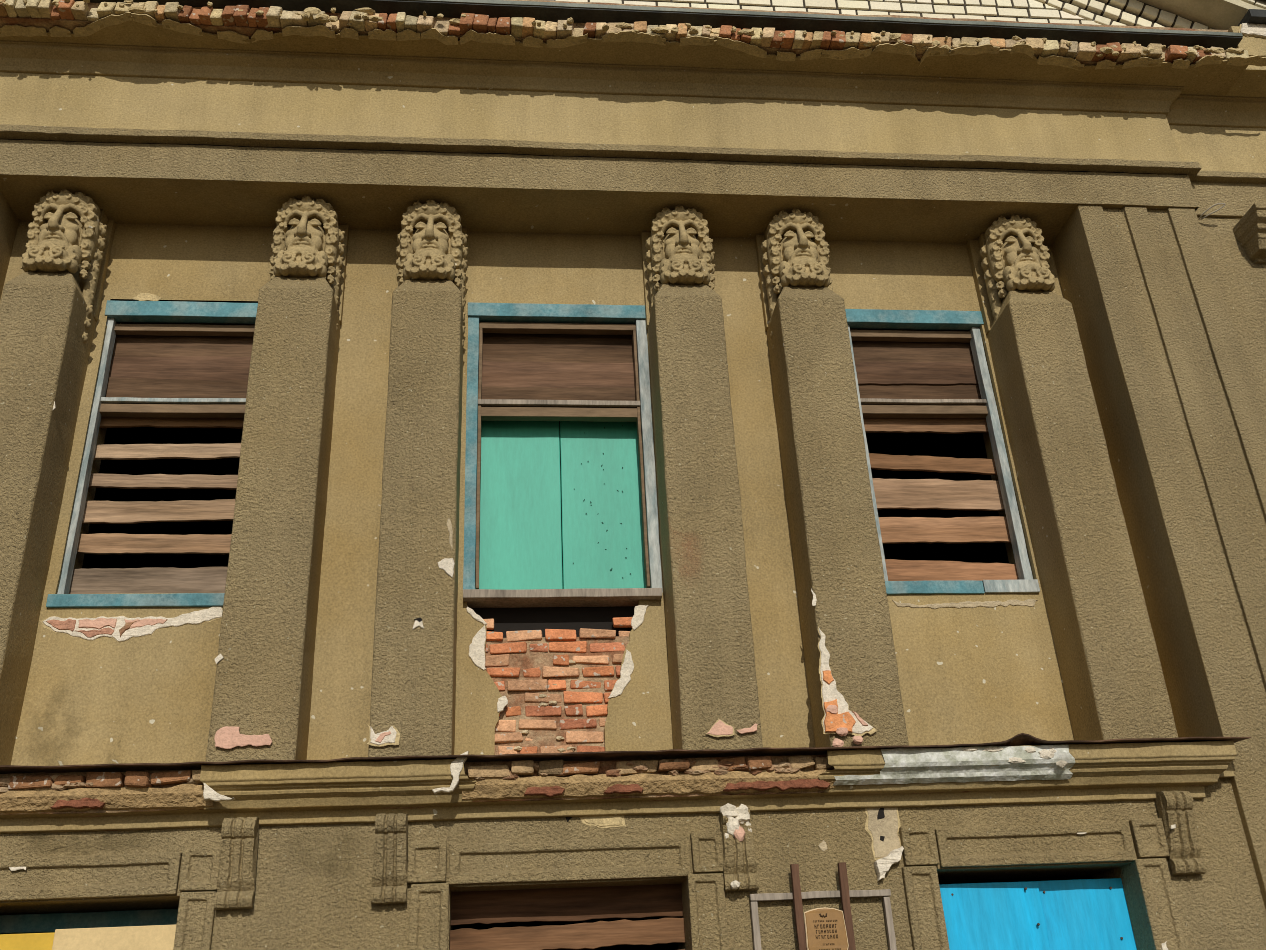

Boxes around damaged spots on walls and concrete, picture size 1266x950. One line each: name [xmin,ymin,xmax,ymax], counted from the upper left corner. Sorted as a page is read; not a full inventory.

spalling [0,0,1266,70]
flaking render [40,606,223,643]
peeling [214,726,272,749]
flaking render [367,725,400,747]
flaking render [432,605,1075,842]
flaking render [0,770,235,814]
flaking render [864,807,904,881]